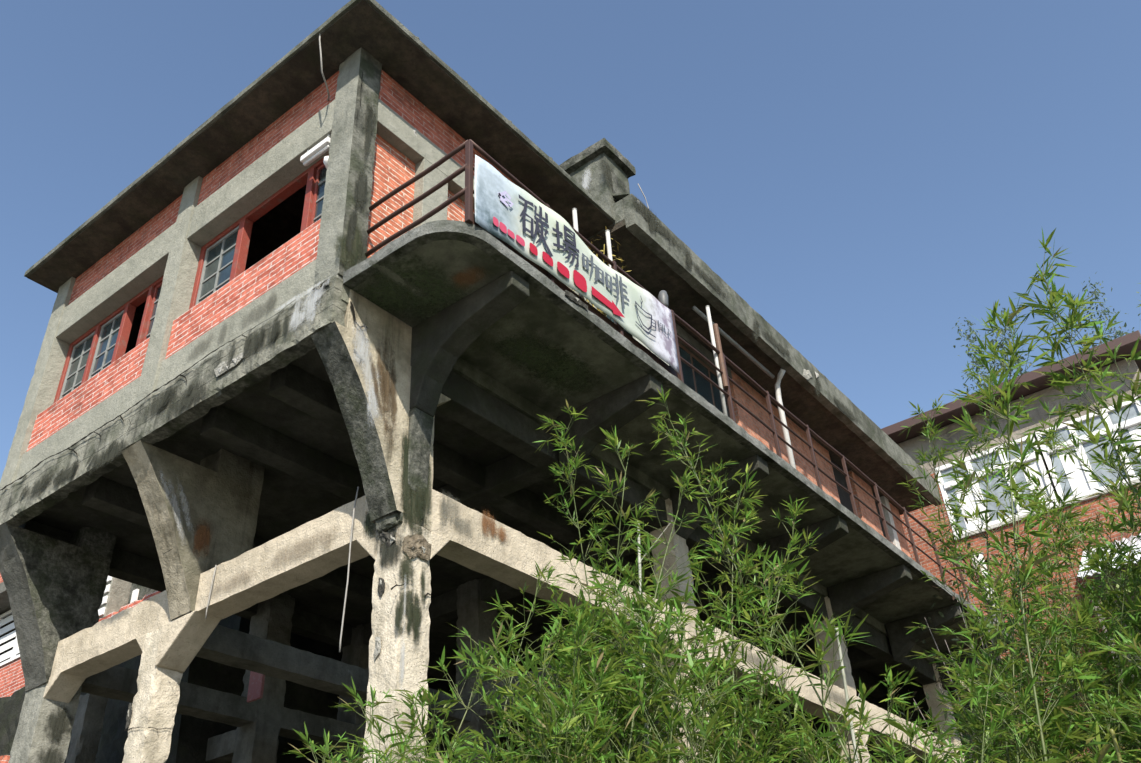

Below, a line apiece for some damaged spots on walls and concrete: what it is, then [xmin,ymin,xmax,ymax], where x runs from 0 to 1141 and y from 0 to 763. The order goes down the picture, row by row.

leakage [365,107,373,157]
leakage [371,343,431,525]
leakage [364,512,388,565]
spalling [379,531,432,561]
rust [483,513,506,541]
leakage [395,553,425,642]
leakage [39,707,73,763]